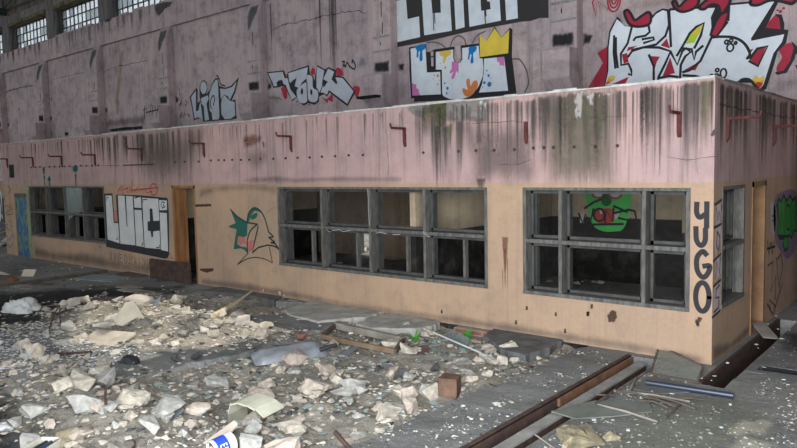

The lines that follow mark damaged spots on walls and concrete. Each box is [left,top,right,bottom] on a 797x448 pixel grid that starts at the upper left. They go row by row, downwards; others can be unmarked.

crack [272,10,365,31]
damp [423,103,467,161]
damp [507,94,607,143]
damp [619,87,662,139]
damp [673,81,795,138]